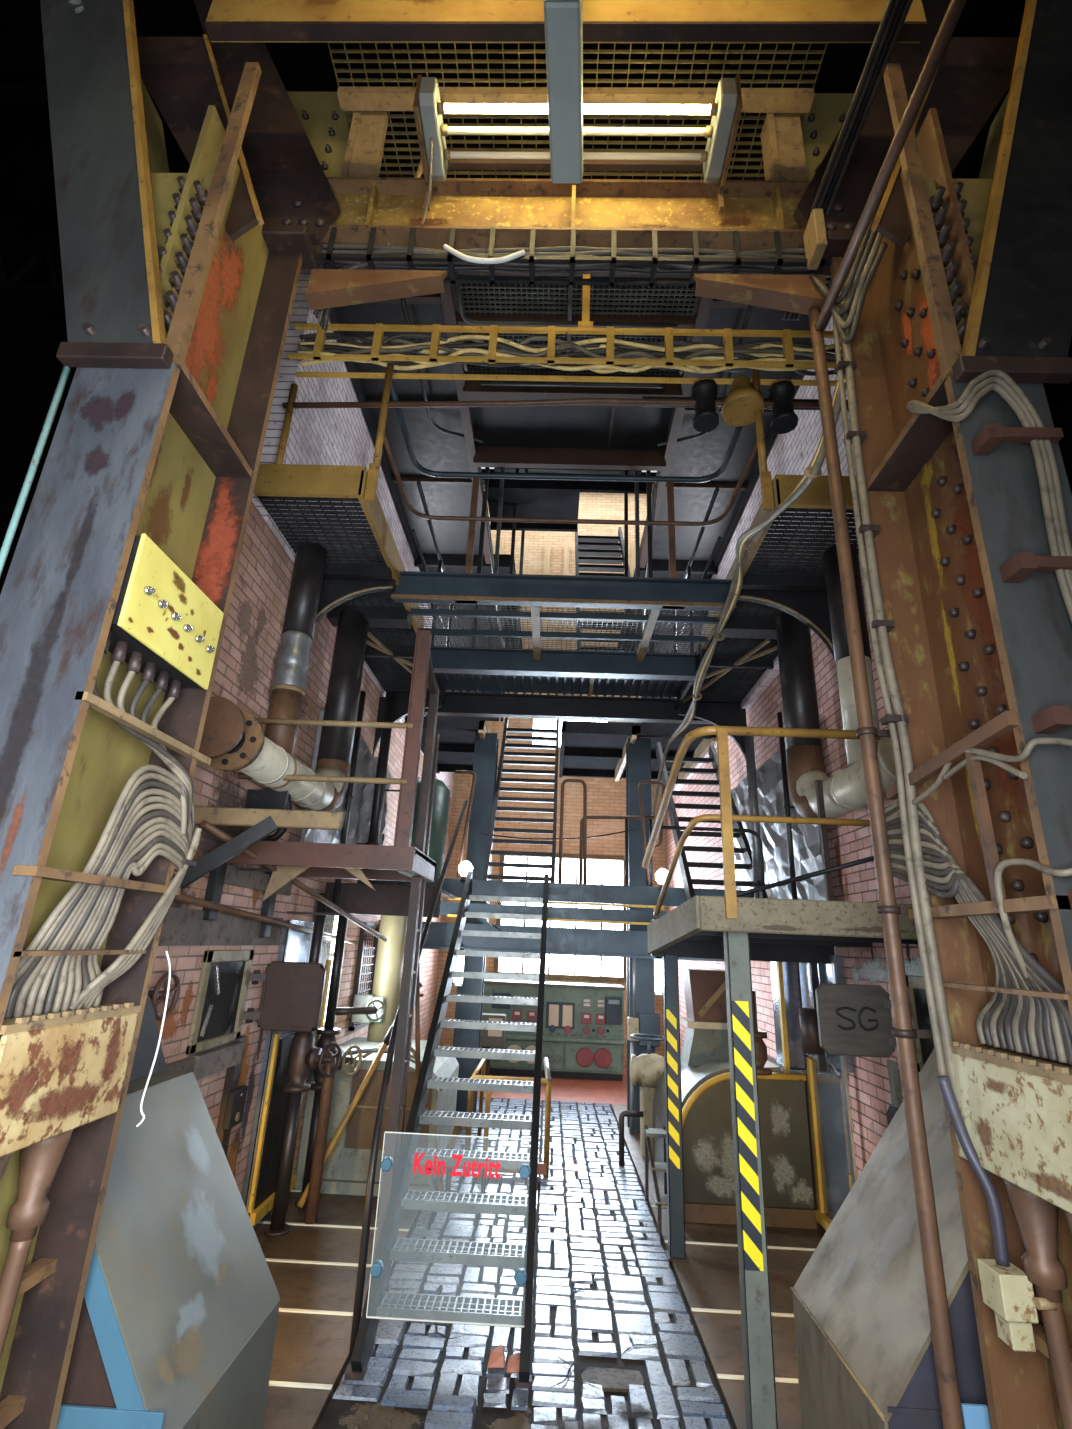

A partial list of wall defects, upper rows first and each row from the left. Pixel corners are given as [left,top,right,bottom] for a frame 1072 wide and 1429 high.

rust [902,290,941,391]
spalling [483,1407,532,1429]